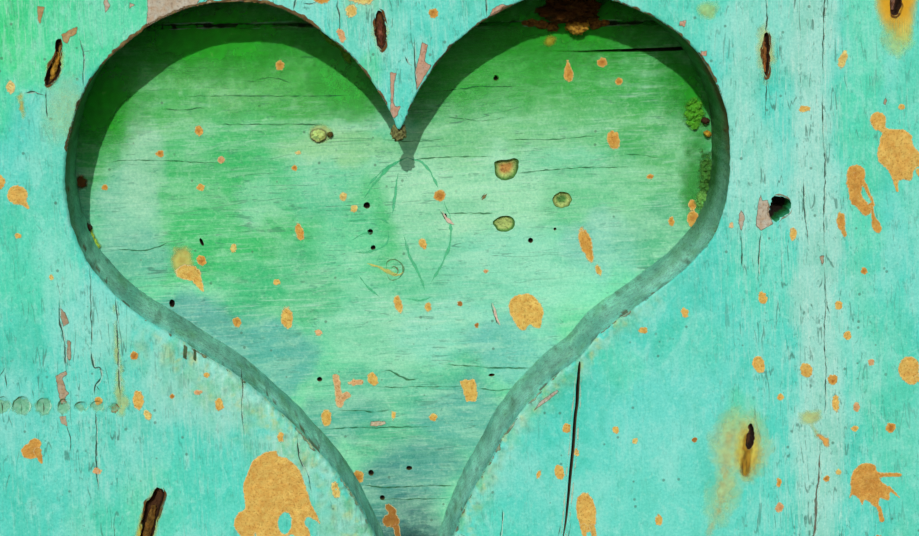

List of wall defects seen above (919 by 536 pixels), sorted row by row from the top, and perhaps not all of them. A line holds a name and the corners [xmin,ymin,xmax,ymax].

peeling [61,27,77,43]
peeling [99,0,371,79]
rust [877,0,916,48]
spalling [64,77,92,152]
peeling [377,72,412,118]
peeling [756,196,773,230]
peeling [56,371,69,404]
rust [719,421,761,496]